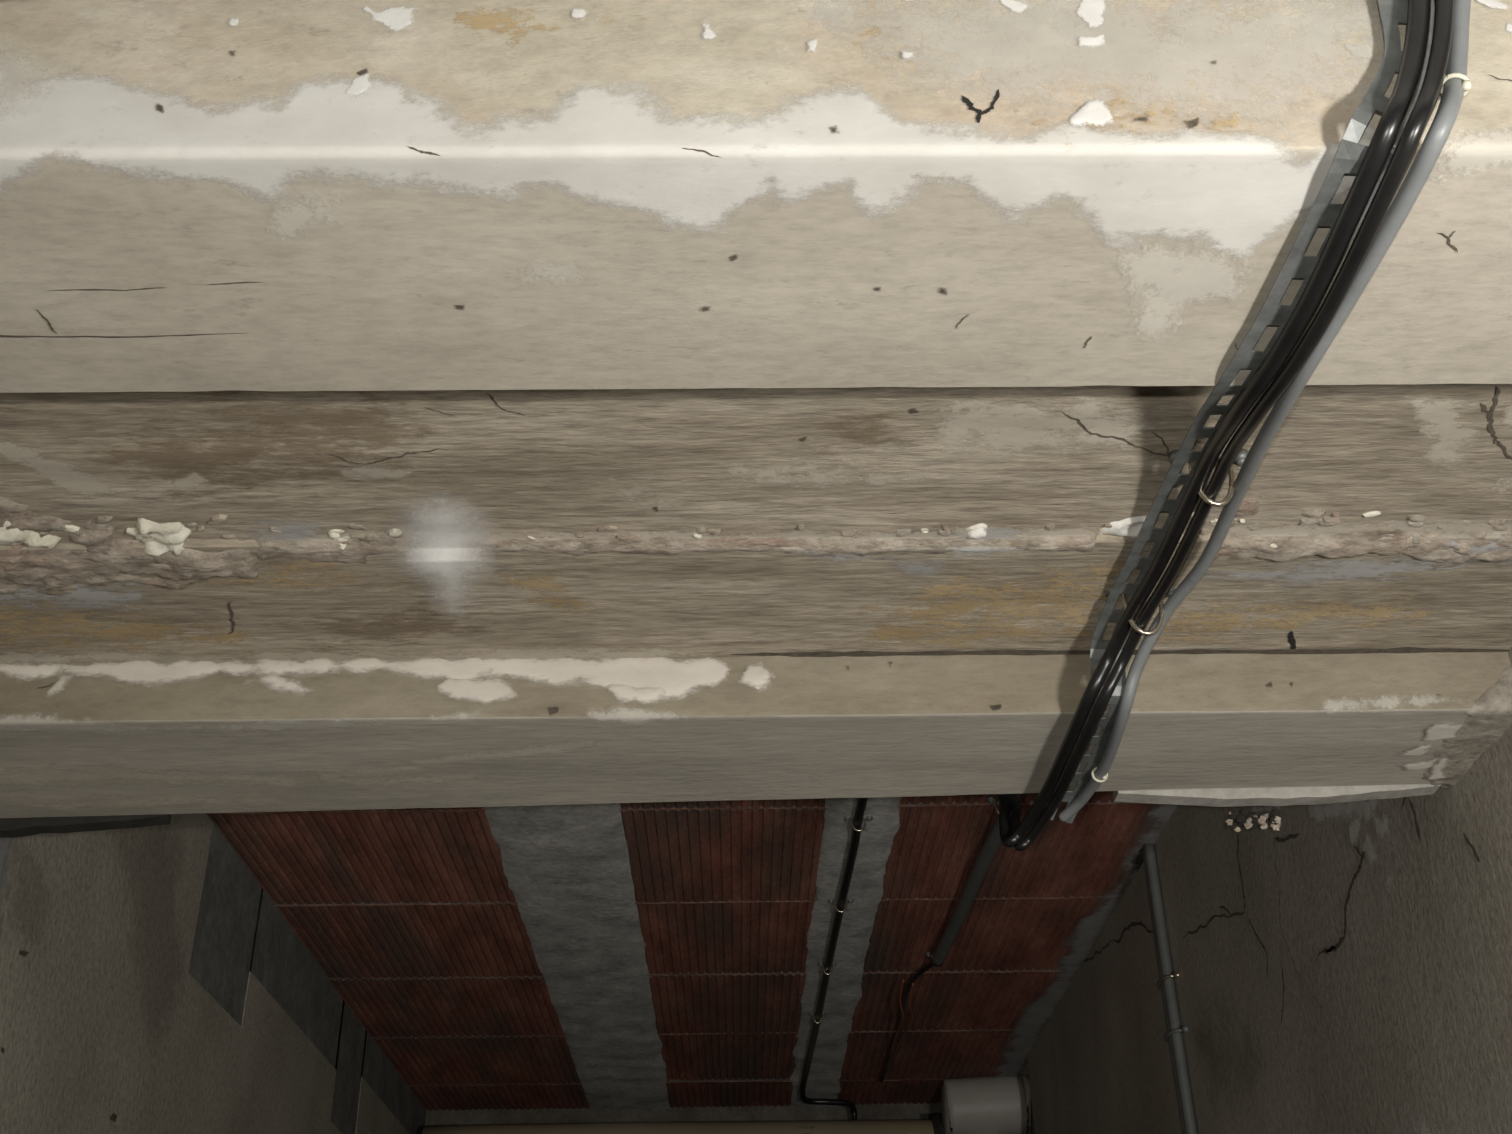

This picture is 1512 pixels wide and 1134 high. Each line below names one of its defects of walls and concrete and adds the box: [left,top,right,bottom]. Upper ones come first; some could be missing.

spalling [962,89,1000,123]
crack [1480,386,1512,459]
damp [0,521,61,549]
damp [135,518,191,557]
damp [1203,521,1512,537]
crack [730,649,1090,657]
crack [1132,631,1510,655]
peeling [437,678,516,703]
peeling [607,684,667,703]
peeling [738,664,773,689]
peeling [1401,723,1462,780]
crack [1084,832,1365,1022]